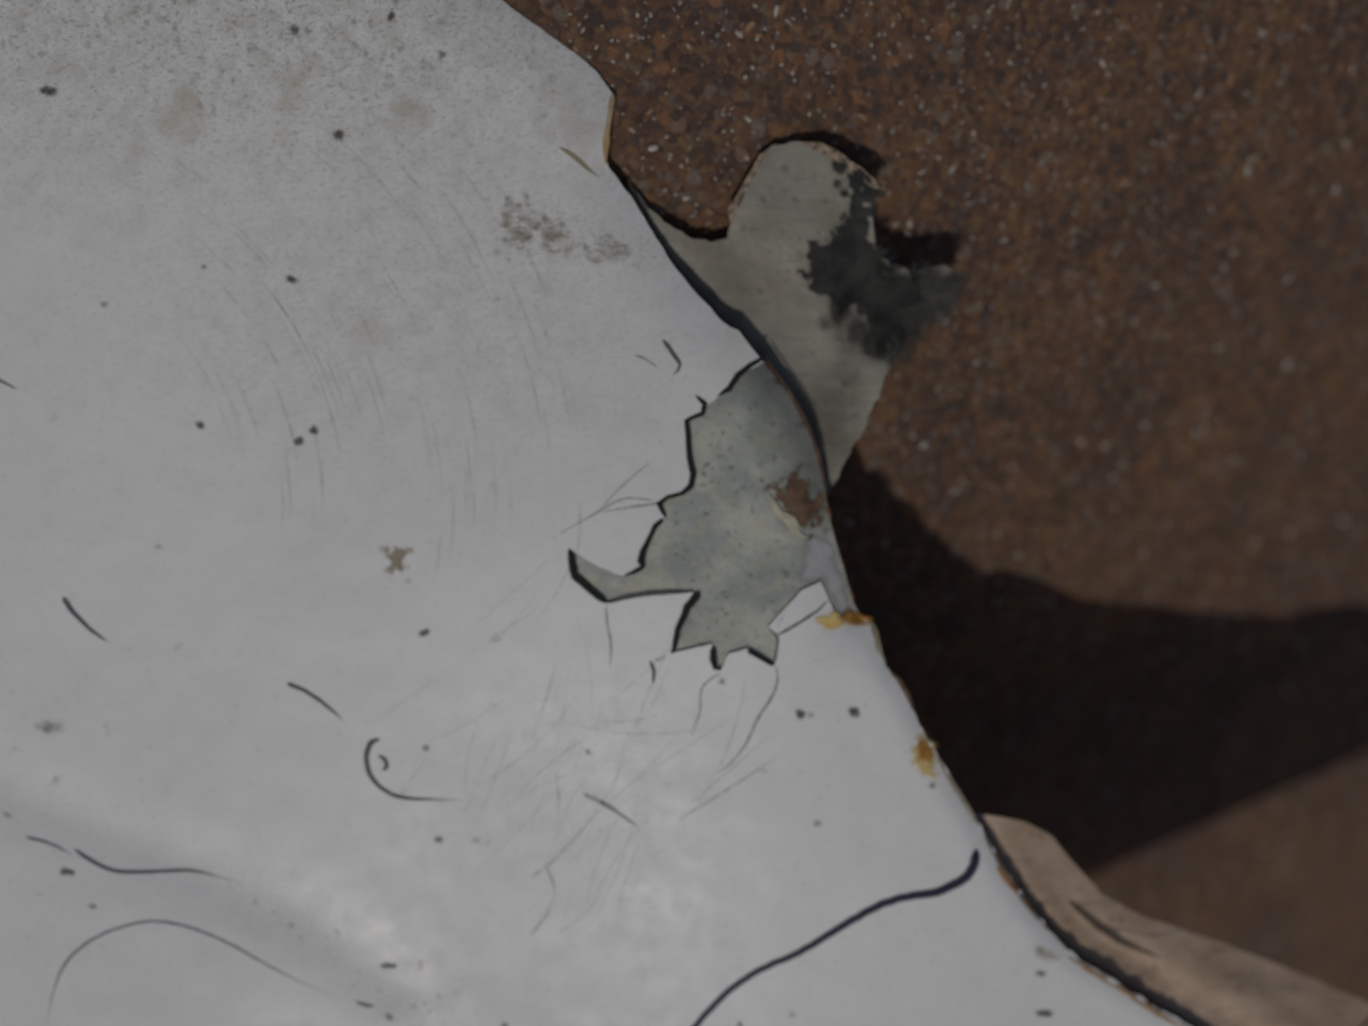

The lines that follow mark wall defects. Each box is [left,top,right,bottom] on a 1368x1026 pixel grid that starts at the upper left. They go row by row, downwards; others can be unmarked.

rust [559,93,614,177]
rust [728,153,765,221]
rust [799,141,878,189]
peeling [797,160,968,364]
peeling [568,357,860,671]
rust [816,611,915,710]
rust [914,737,1047,930]